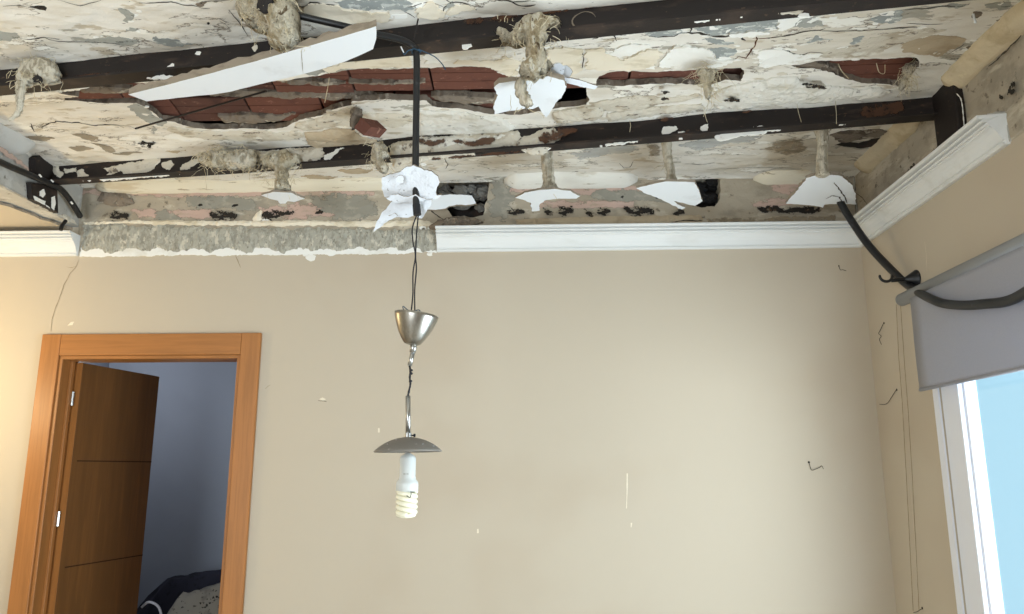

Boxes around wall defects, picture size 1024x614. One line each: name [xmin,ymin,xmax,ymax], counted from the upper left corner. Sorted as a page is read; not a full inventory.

peeling [301,0,476,24]
peeling [941,1,1012,21]
peeling [0,31,20,41]
peeling [85,8,192,47]
peeling [545,10,977,89]
spalling [0,47,522,134]
spalling [836,138,880,149]
peeling [301,168,373,180]
spalling [436,184,489,216]
spalling [696,179,718,208]